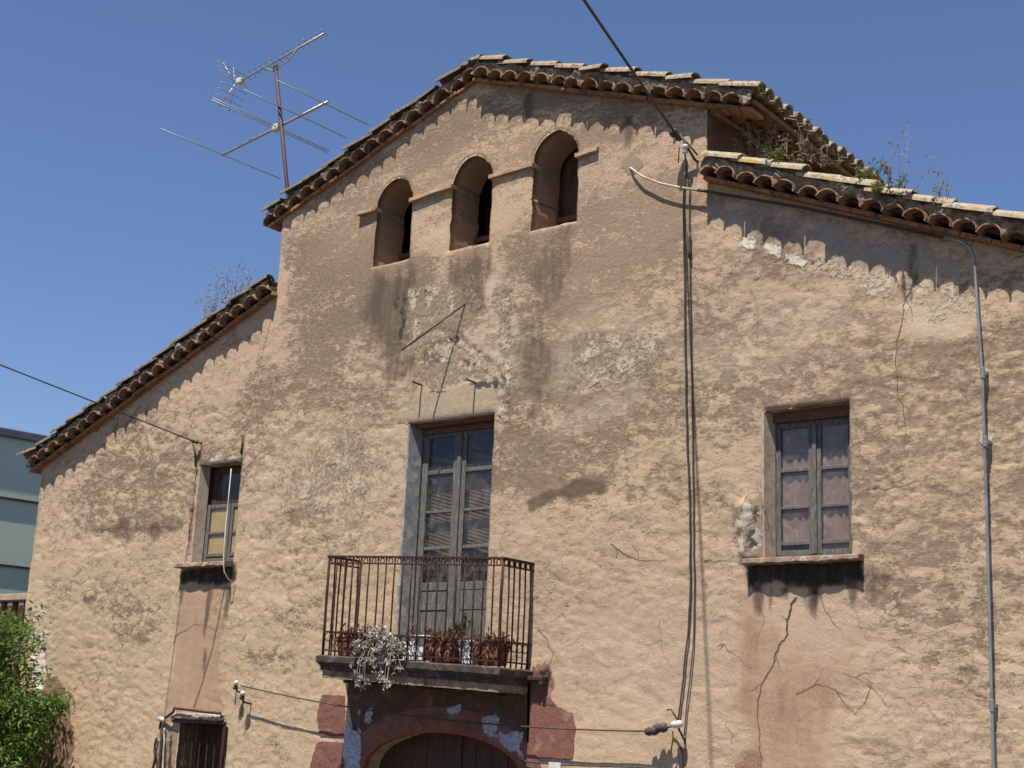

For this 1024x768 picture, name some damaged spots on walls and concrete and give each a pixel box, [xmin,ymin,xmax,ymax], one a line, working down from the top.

peeling [736,231,808,270]
leakage [366,264,415,379]
crack [895,265,920,439]
leakage [753,582,762,611]
leakage [808,581,818,610]
peeling [447,704,461,718]
flaking render [481,662,576,763]
crack [718,596,839,756]
crack [796,672,884,716]